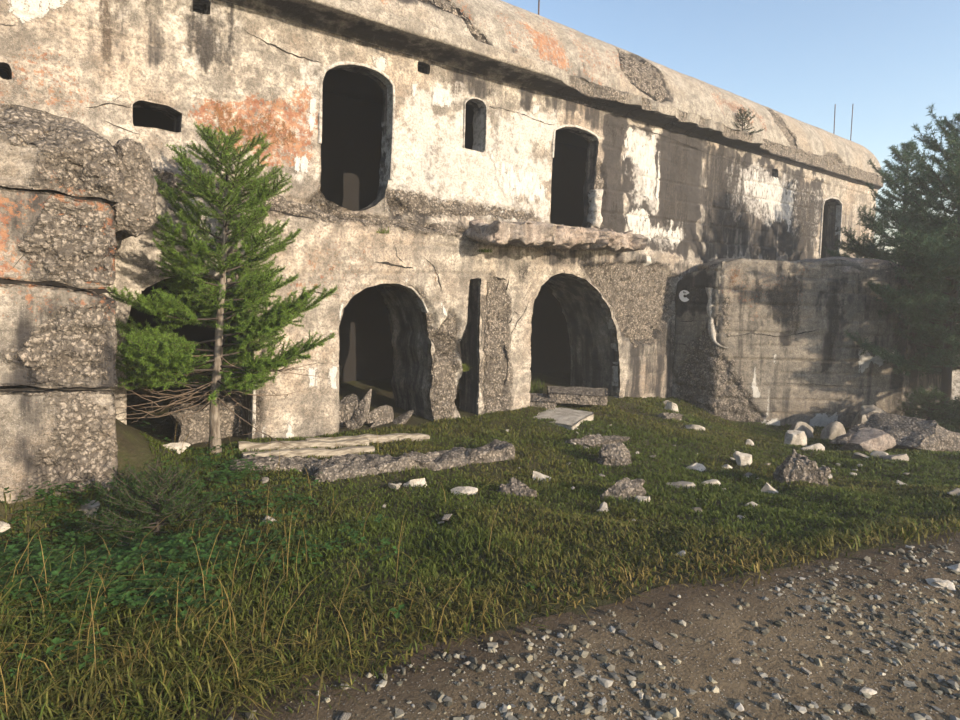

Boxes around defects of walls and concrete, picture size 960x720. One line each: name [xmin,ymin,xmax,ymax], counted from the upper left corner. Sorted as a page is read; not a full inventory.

peeling [7,0,75,23]
damp [99,0,125,65]
damp [187,2,235,74]
spalling [421,0,486,43]
spalling [619,51,669,102]
rust [207,98,296,152]
damp [655,136,691,246]
damp [704,142,754,243]
spalling [584,262,676,348]
damp [756,274,801,335]
spalling [675,310,769,423]